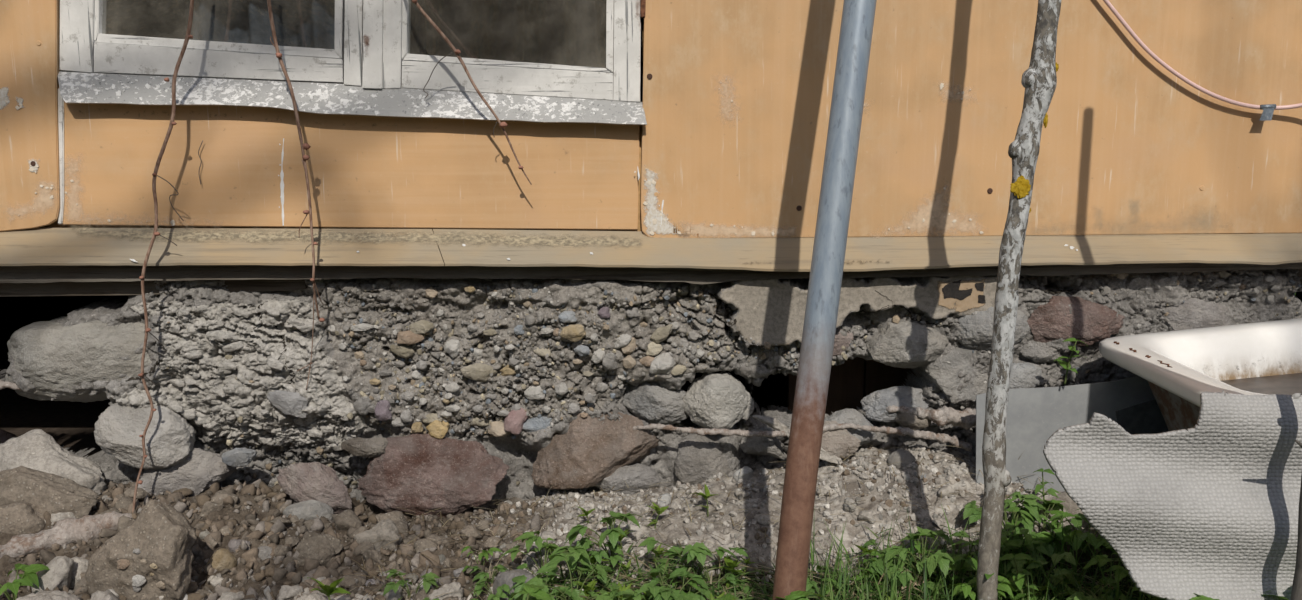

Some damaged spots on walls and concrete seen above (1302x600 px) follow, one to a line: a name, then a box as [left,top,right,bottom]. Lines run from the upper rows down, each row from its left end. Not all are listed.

peeling [70,76,224,96]
peeling [0,87,23,110]
peeling [407,94,586,112]
peeling [886,187,983,234]
peeling [937,279,986,312]